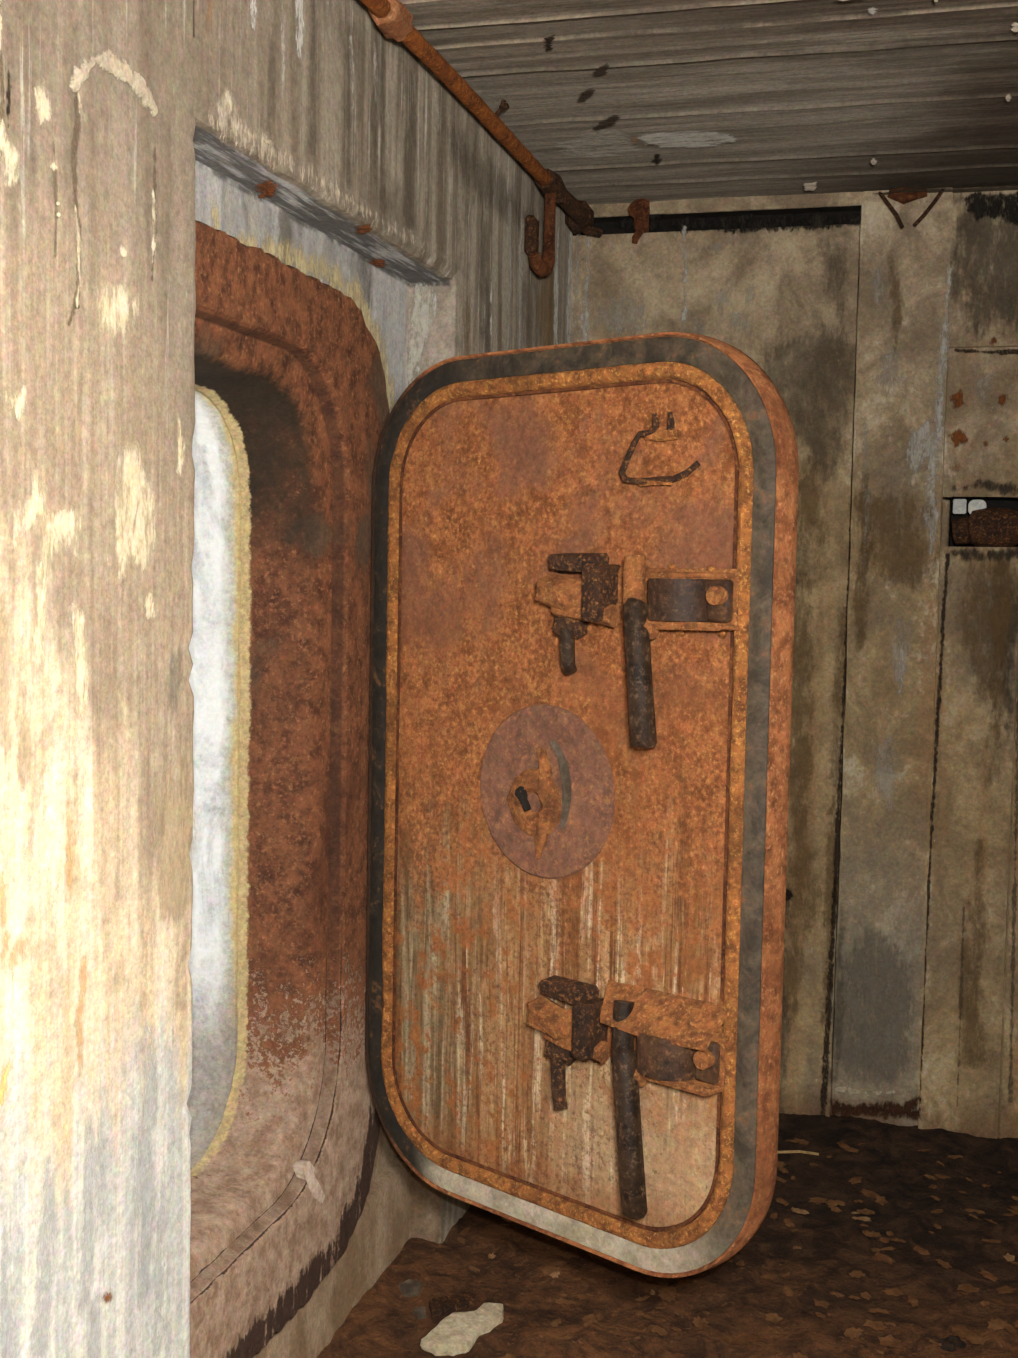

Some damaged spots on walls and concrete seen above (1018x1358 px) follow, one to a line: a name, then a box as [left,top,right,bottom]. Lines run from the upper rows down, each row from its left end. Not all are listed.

rust [256,180,280,198]
damp [789,616,838,943]